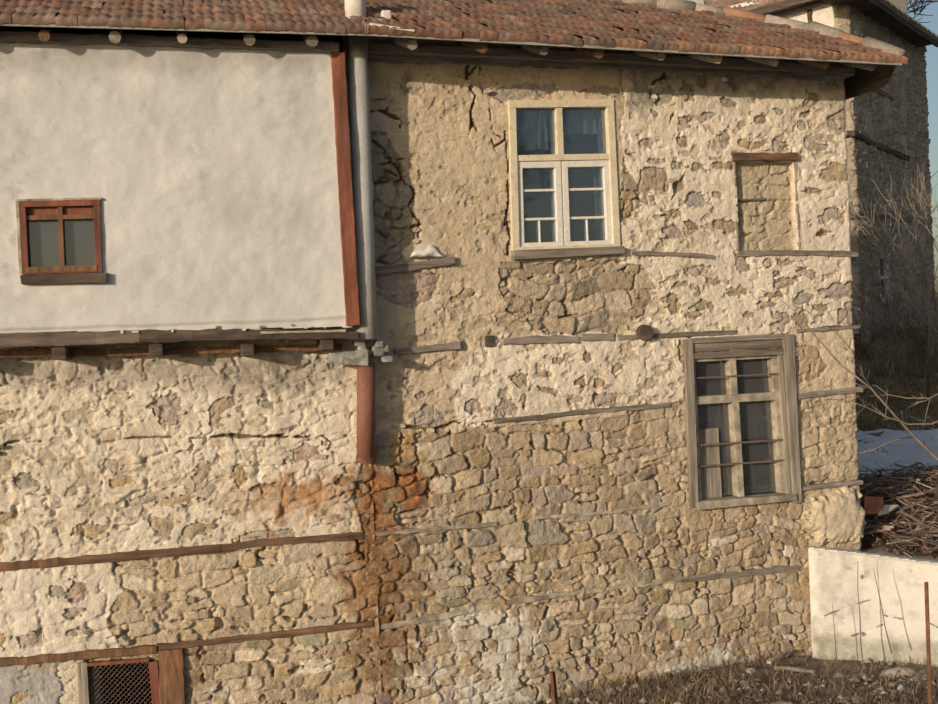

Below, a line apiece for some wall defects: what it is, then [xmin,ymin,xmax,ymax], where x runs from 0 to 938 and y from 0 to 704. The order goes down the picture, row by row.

crack [464,64,511,255]
spalling [371,129,441,309]
spalling [734,252,753,273]
spalling [450,287,482,303]
spalling [498,257,860,336]
spalling [794,341,829,385]
spalling [146,392,186,425]
spalling [413,390,448,429]
crack [105,433,344,442]
rust [349,431,427,536]
spalling [48,575,95,638]
crack [824,600,903,637]